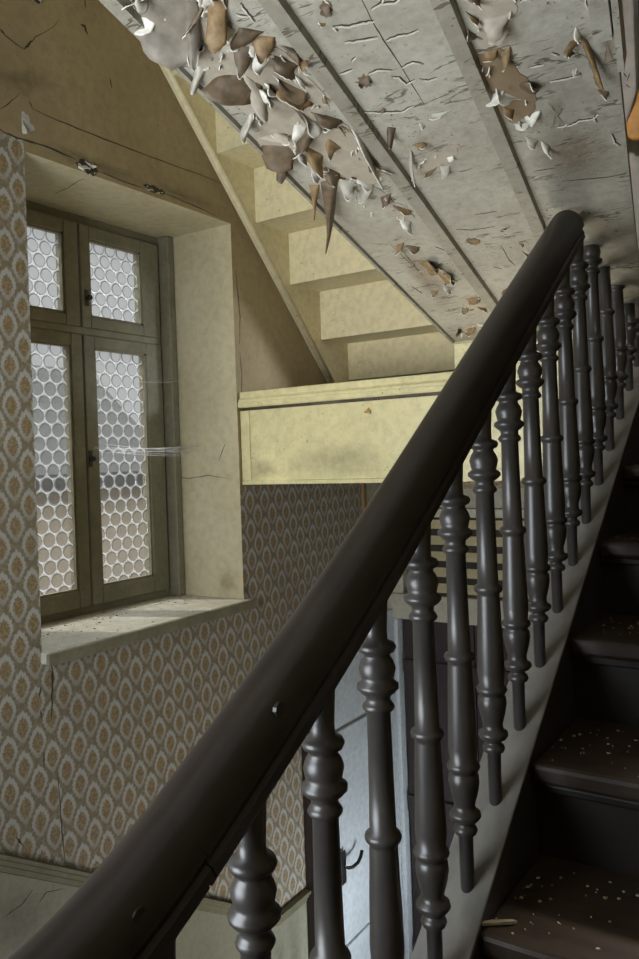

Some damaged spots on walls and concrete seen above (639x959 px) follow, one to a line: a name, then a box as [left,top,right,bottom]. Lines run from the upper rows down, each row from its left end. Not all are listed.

crack [0,0,88,50]
crack [332,0,438,114]
peeling [464,0,552,160]
crack [530,52,580,83]
crack [557,114,621,146]
peeling [122,0,488,338]
crack [537,168,625,181]